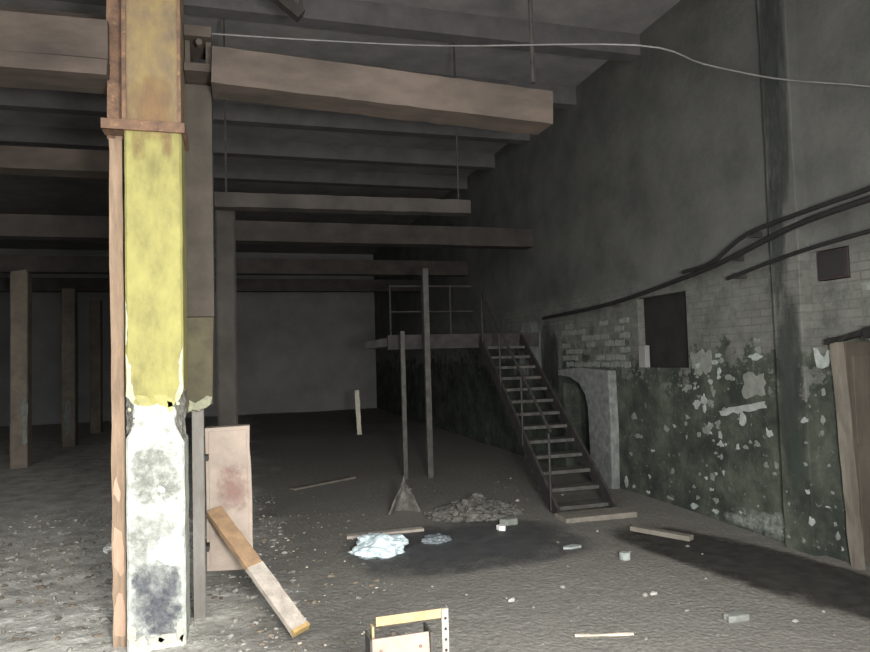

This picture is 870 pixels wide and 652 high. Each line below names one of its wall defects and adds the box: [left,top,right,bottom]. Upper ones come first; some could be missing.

damp [761,0,788,299]
flaking render [748,338,763,361]
peeling [813,347,831,369]
flaking render [664,349,773,514]
damp [726,509,785,537]
flaking render [149,536,184,566]
damp [132,576,149,595]
damp [147,573,180,633]
spalling [127,620,186,648]